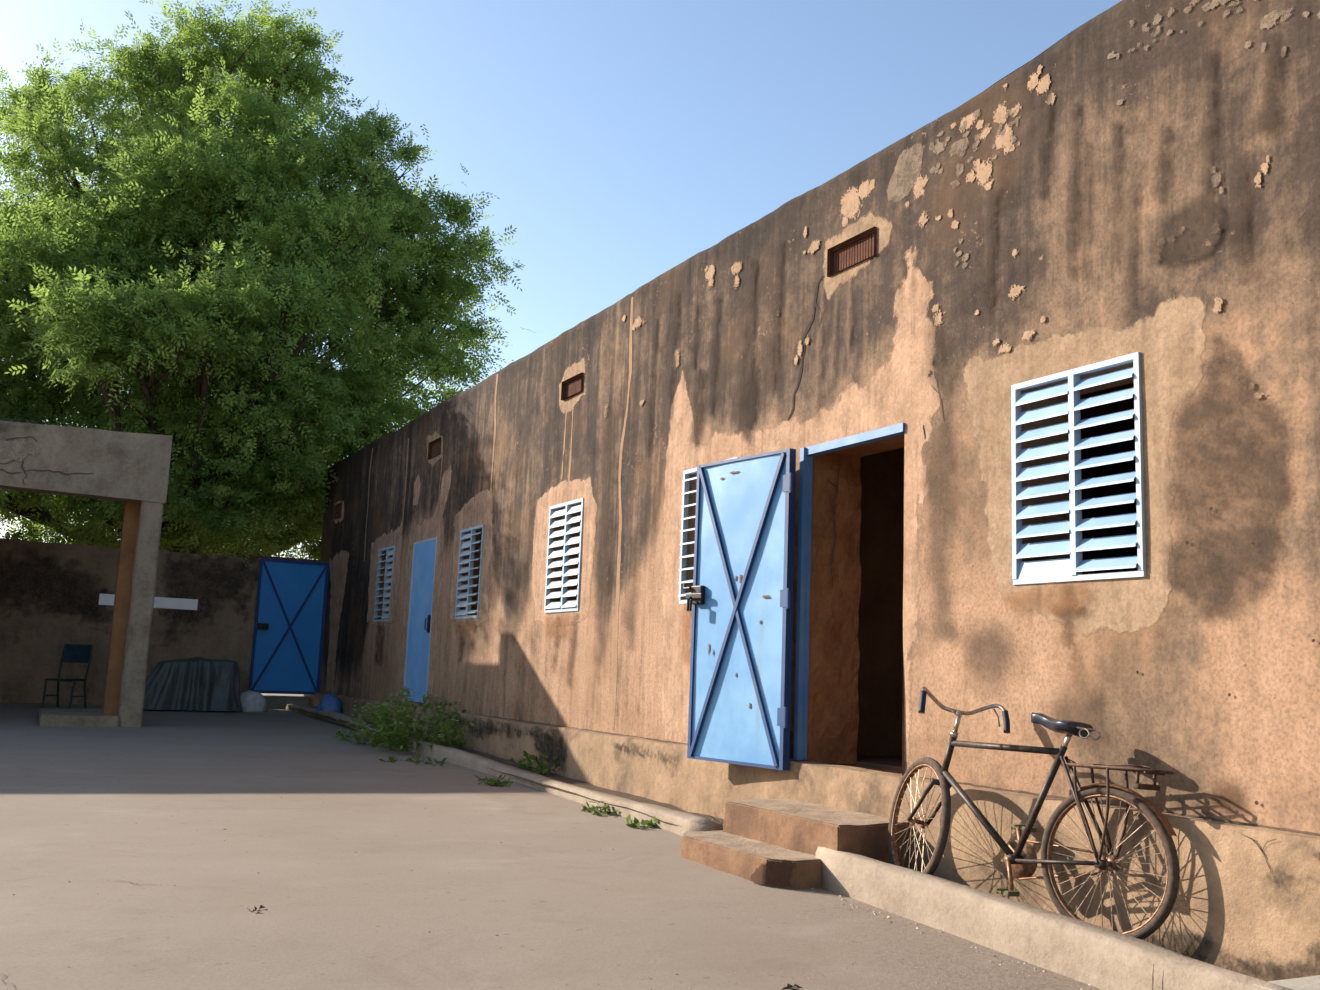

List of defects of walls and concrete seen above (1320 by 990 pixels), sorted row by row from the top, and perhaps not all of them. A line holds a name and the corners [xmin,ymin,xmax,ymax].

flaking render [1107,0,1256,59]
flaking render [1244,8,1320,57]
flaking render [1027,64,1056,105]
flaking render [905,83,1022,268]
damp [1066,105,1087,275]
damp [1152,53,1248,279]
flaking render [1008,284,1025,301]
crack [787,276,824,420]
crack [0,436,94,484]
damp [1166,339,1287,616]
damp [0,551,108,620]
damp [1145,929,1320,982]